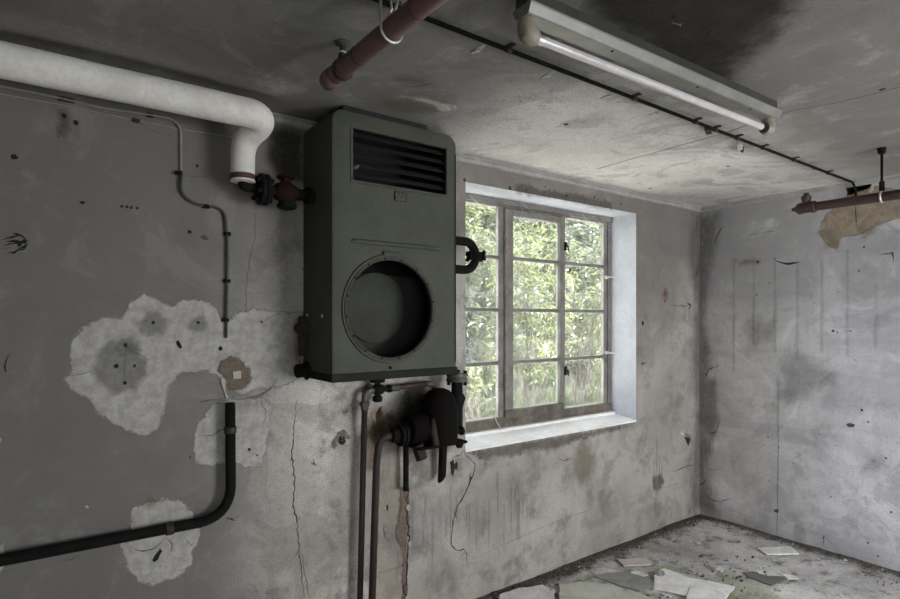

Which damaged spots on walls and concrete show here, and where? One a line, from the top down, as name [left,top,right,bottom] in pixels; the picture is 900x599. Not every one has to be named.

peeling [820,184,900,248]
peeling [63,295,303,467]
peeling [120,499,200,586]
crack [291,402,317,597]
spalling [396,488,411,599]
crack [450,450,608,560]